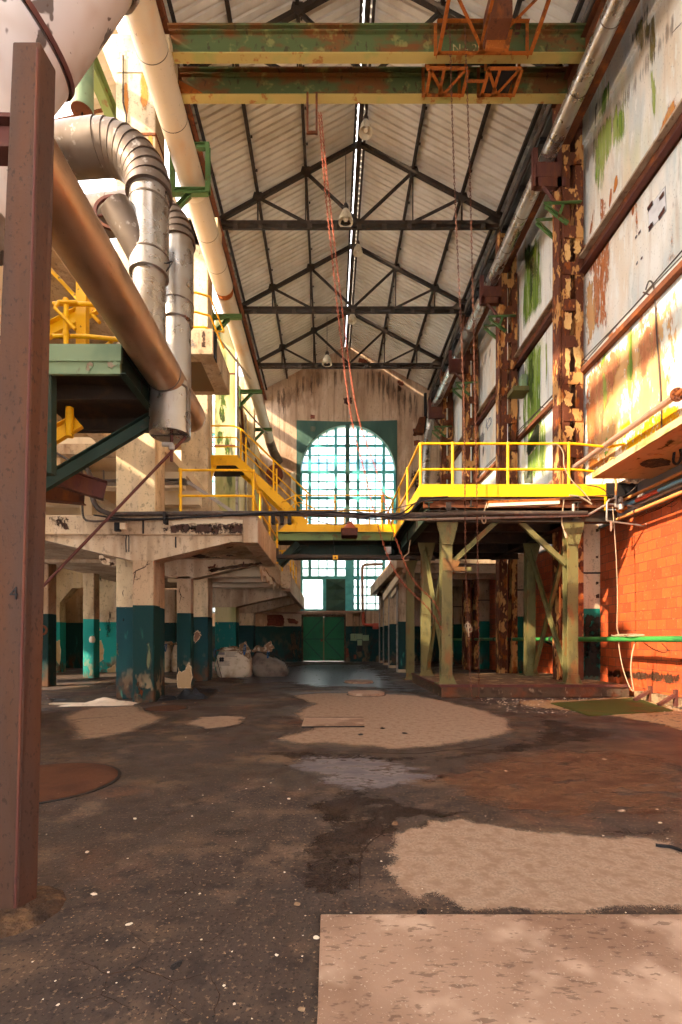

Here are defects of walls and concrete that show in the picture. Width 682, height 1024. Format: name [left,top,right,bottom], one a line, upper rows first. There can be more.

damp [632,7,648,50]
damp [595,82,609,124]
damp [523,239,540,321]
peeling [564,241,581,262]
peeling [564,278,582,330]
rust [586,242,610,344]
rust [587,292,676,474]
damp [238,631,682,914]